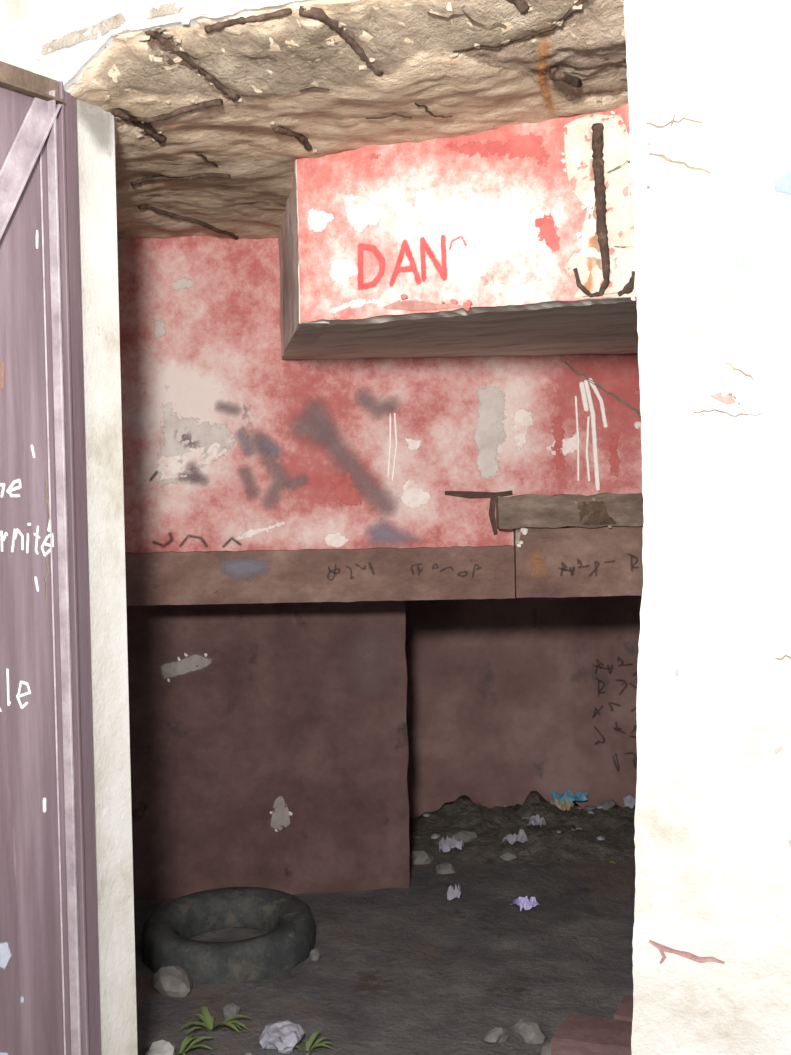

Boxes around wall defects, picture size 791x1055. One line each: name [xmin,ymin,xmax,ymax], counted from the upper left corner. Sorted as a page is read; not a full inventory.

spalling [34,0,650,301]
rust [585,205,601,291]
peeling [155,385,235,489]
peeling [474,386,533,480]
spalling [161,653,212,682]
spalling [270,796,293,832]
crack [649,940,725,964]